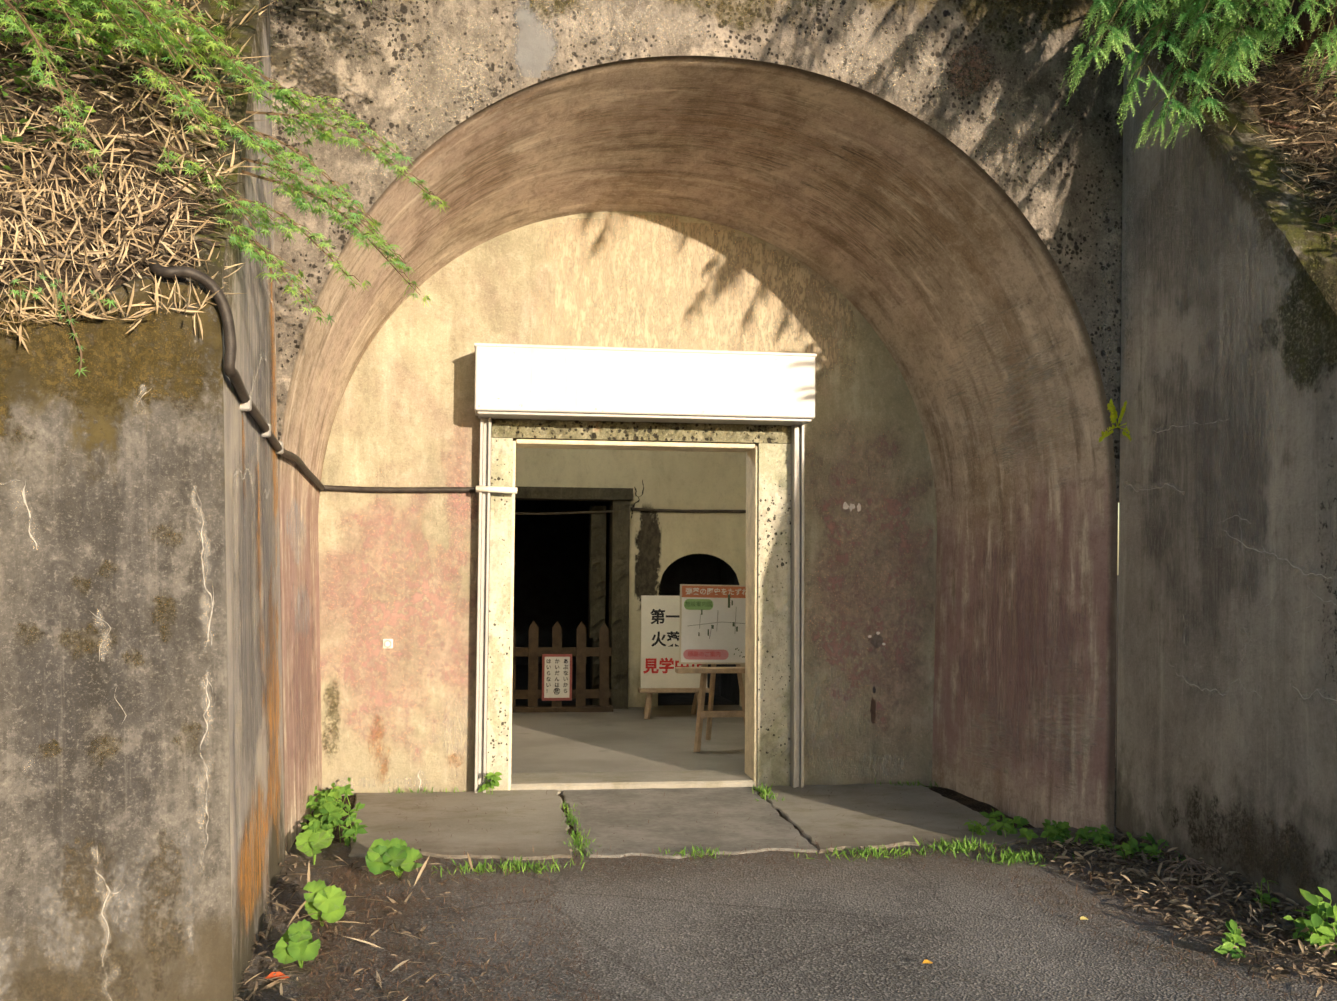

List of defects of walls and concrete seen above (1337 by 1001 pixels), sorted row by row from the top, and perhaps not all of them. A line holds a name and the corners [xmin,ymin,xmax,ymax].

crack [22,480,37,550]
crack [198,497,214,645]
corrosion [238,272,280,921]
crack [1219,511,1336,605]
crack [200,677,213,848]
water stain [1172,786,1337,895]
crack [97,851,125,959]